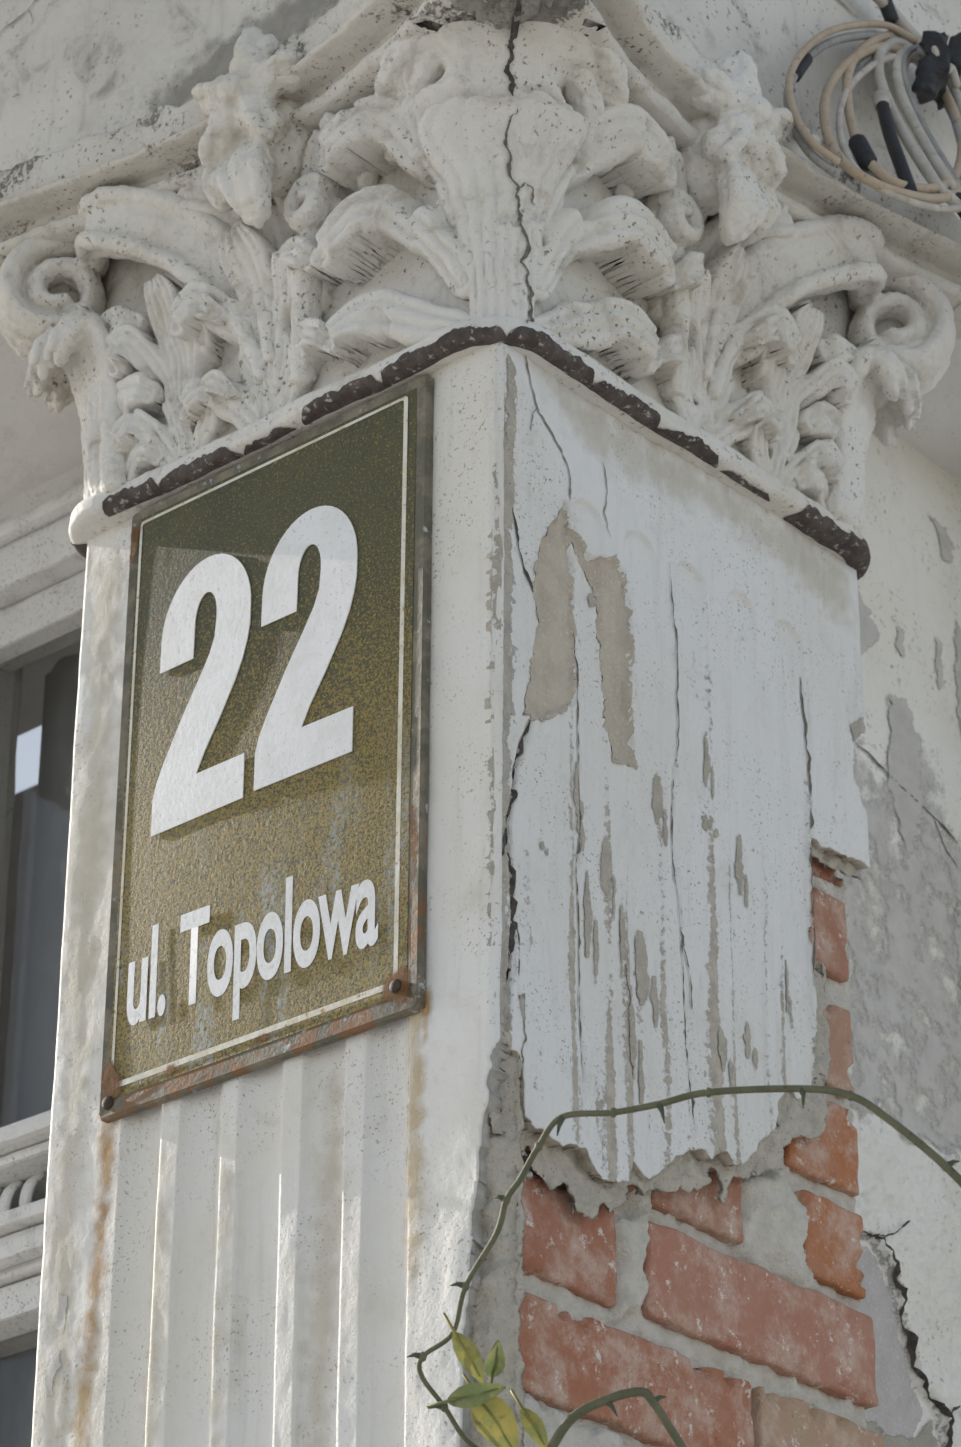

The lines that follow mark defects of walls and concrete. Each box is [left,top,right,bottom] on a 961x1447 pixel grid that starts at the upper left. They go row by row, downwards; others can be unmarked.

crack [503,0,572,499]
spalling [102,325,770,1024]
crack [509,483,533,592]
peeling [783,504,905,657]
crack [502,721,531,980]
peeling [574,762,660,1104]
peeling [811,694,961,1162]
corrosion [88,1259,100,1326]
corrosion [98,1204,106,1241]
corrosion [100,1136,111,1186]
spalling [488,959,831,1220]
crack [863,1220,961,1447]